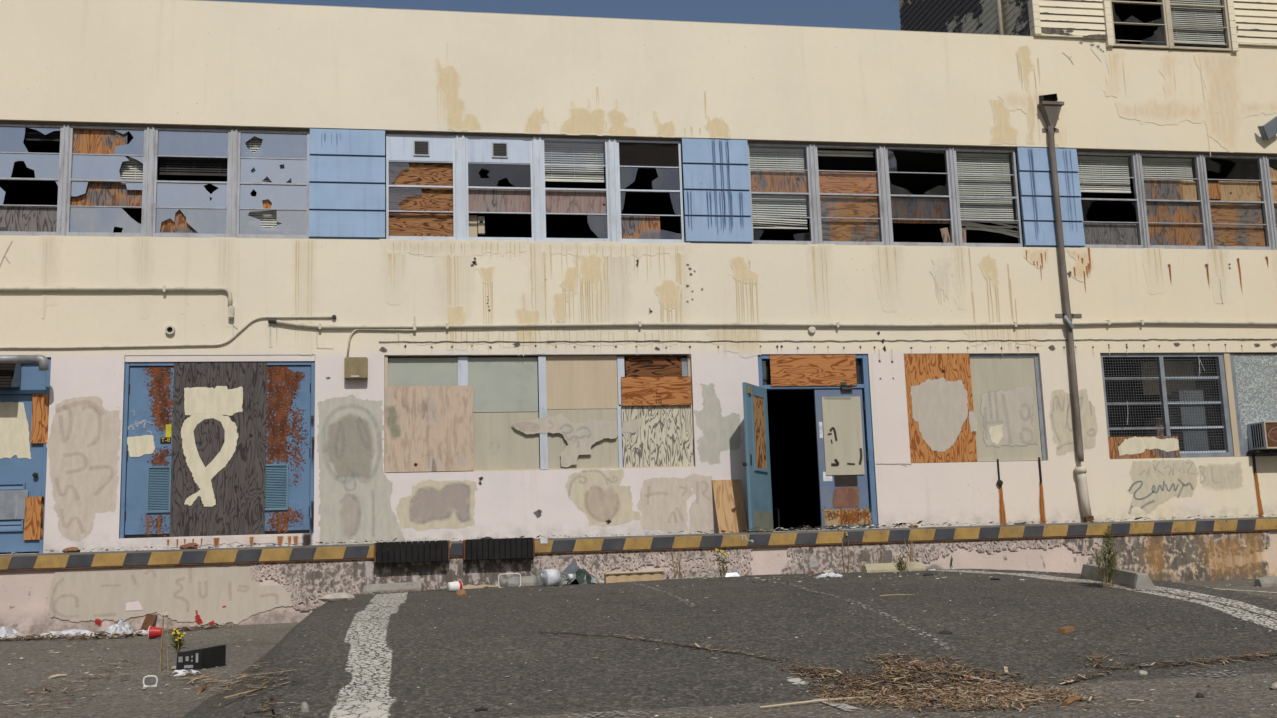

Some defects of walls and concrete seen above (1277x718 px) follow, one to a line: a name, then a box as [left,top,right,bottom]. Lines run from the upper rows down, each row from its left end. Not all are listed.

water stain [435,42,482,132]
water stain [524,87,637,136]
water stain [653,91,731,139]
water stain [990,44,1069,148]
rust [1024,247,1050,279]
rust [1067,247,1095,290]
water stain [378,239,763,358]